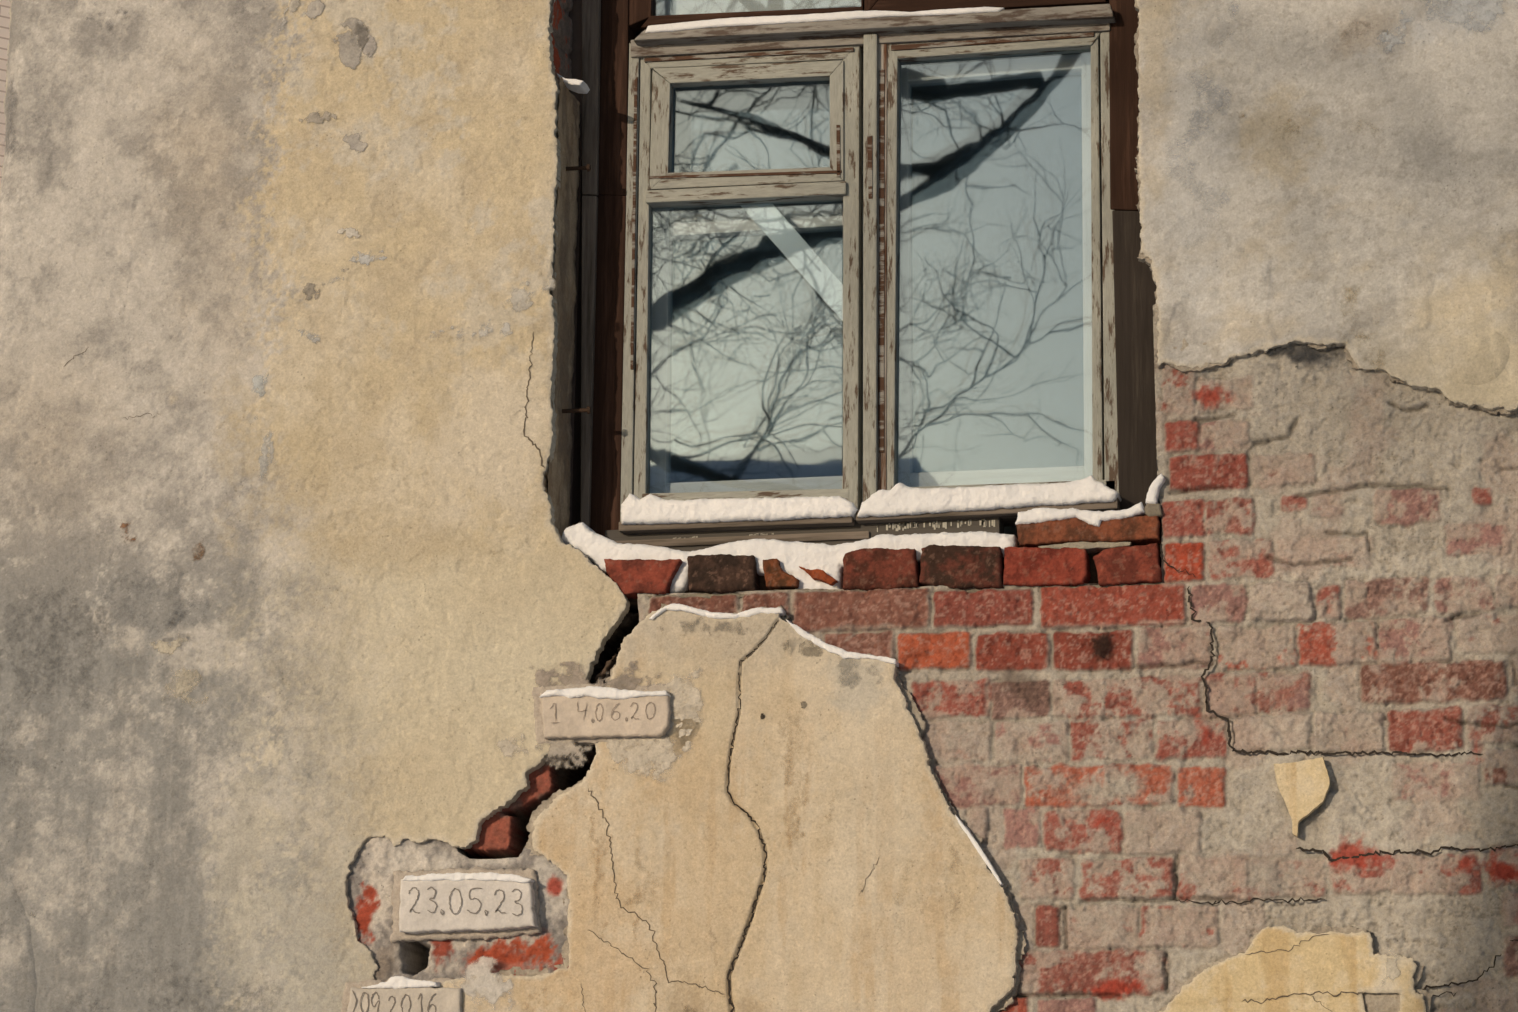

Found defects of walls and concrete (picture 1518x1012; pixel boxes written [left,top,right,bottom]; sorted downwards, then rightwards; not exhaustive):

flaking render [549,0,573,89]
crack [523,331,545,468]
flaking render [594,304,1518,1012]
crack [1160,543,1483,757]
flaking render [347,836,570,982]
crack [464,611,778,1012]
crack [1177,897,1329,955]
crack [1243,991,1363,1011]
crack [1296,844,1518,861]
crack [1422,939,1518,997]